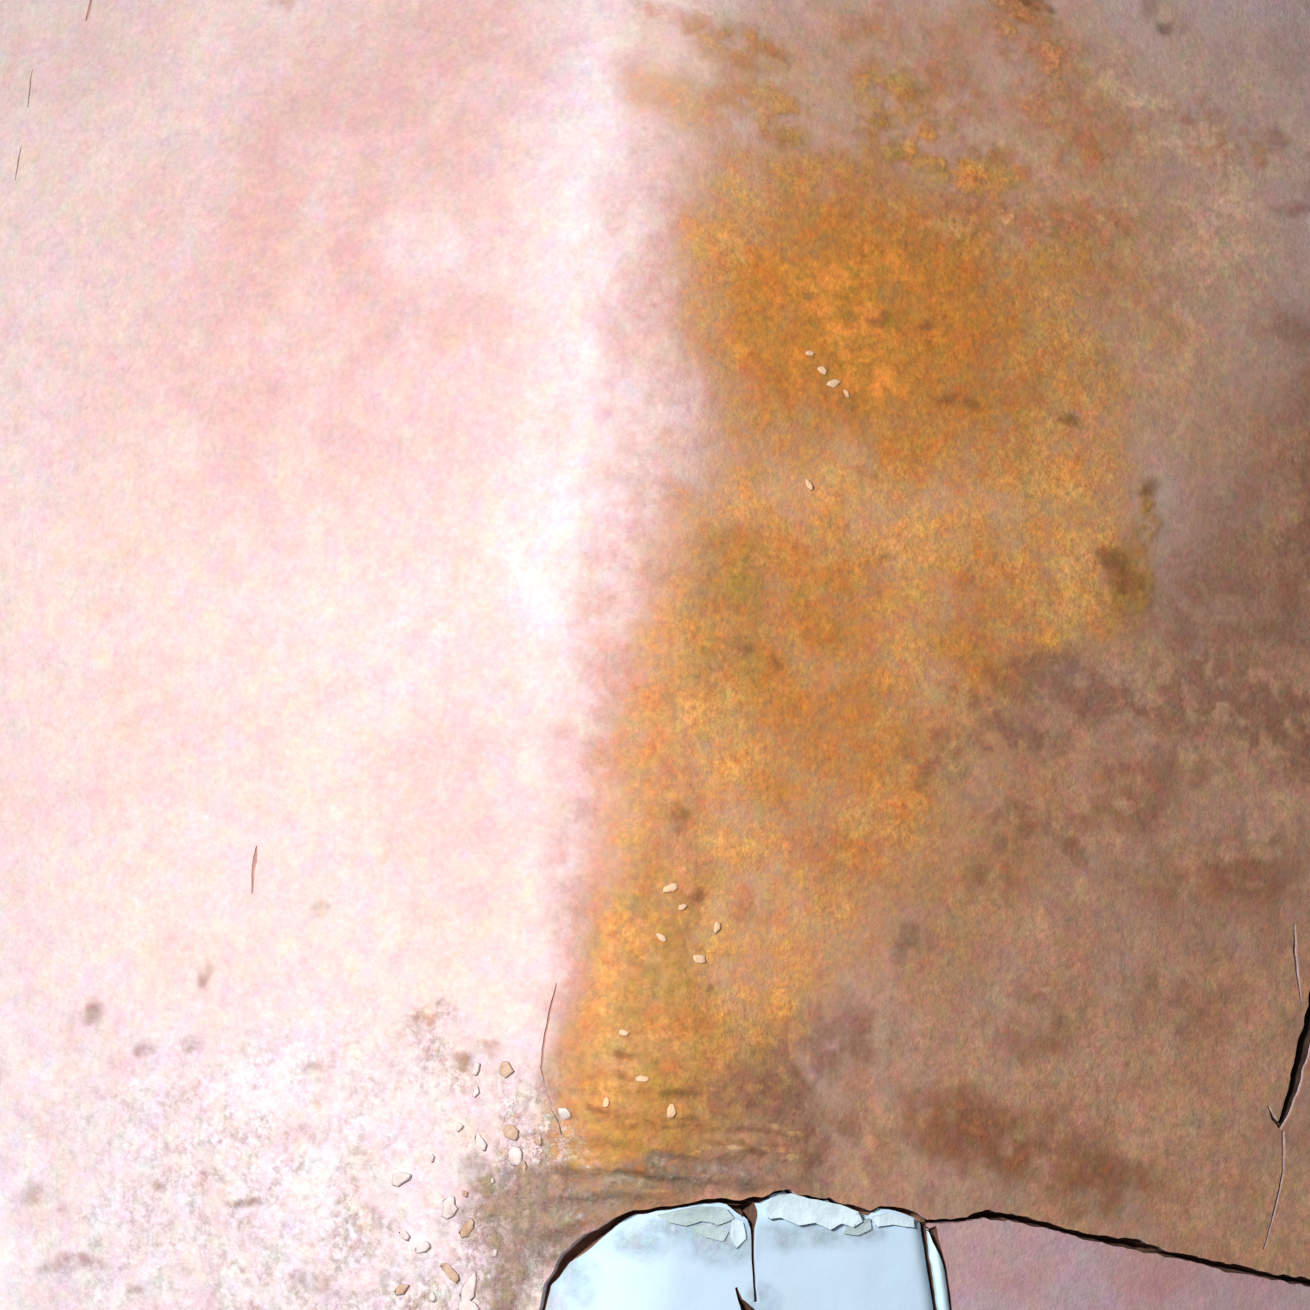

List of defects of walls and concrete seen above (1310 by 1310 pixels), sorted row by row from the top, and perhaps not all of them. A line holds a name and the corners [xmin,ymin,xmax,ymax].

flaking render [806,351,850,398]
corrosion [565,0,1310,1176]
flaking render [662,883,687,910]
flaking render [411,1016,480,1097]
crack [541,932,1310,1310]
flaking render [381,1061,914,1310]
flaking render [321,1194,383,1268]